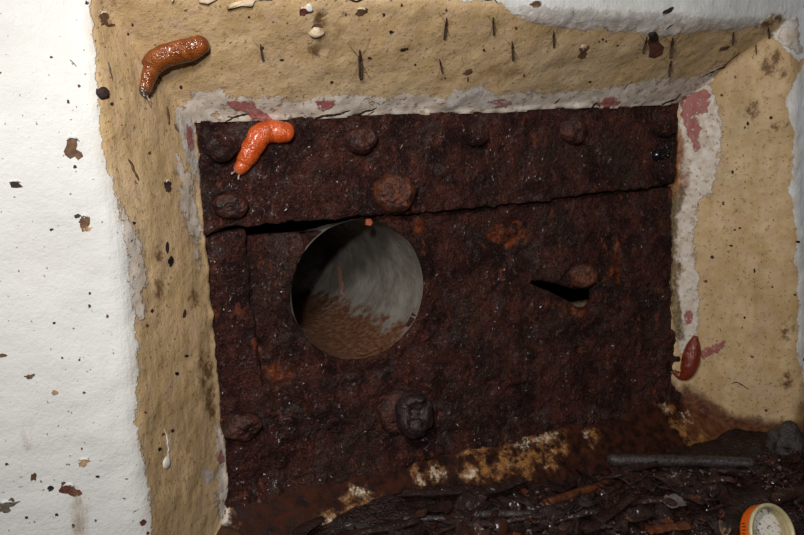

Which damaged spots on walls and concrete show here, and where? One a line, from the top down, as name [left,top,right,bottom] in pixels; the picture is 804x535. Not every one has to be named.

peeling [98,11,115,27]
peeling [227,0,258,18]
spalling [299,4,325,56]
peeling [514,0,762,61]
peeling [96,86,114,106]
peeling [116,192,154,327]
peeling [701,341,726,359]
peeling [203,422,233,525]
corrosion [222,385,783,535]